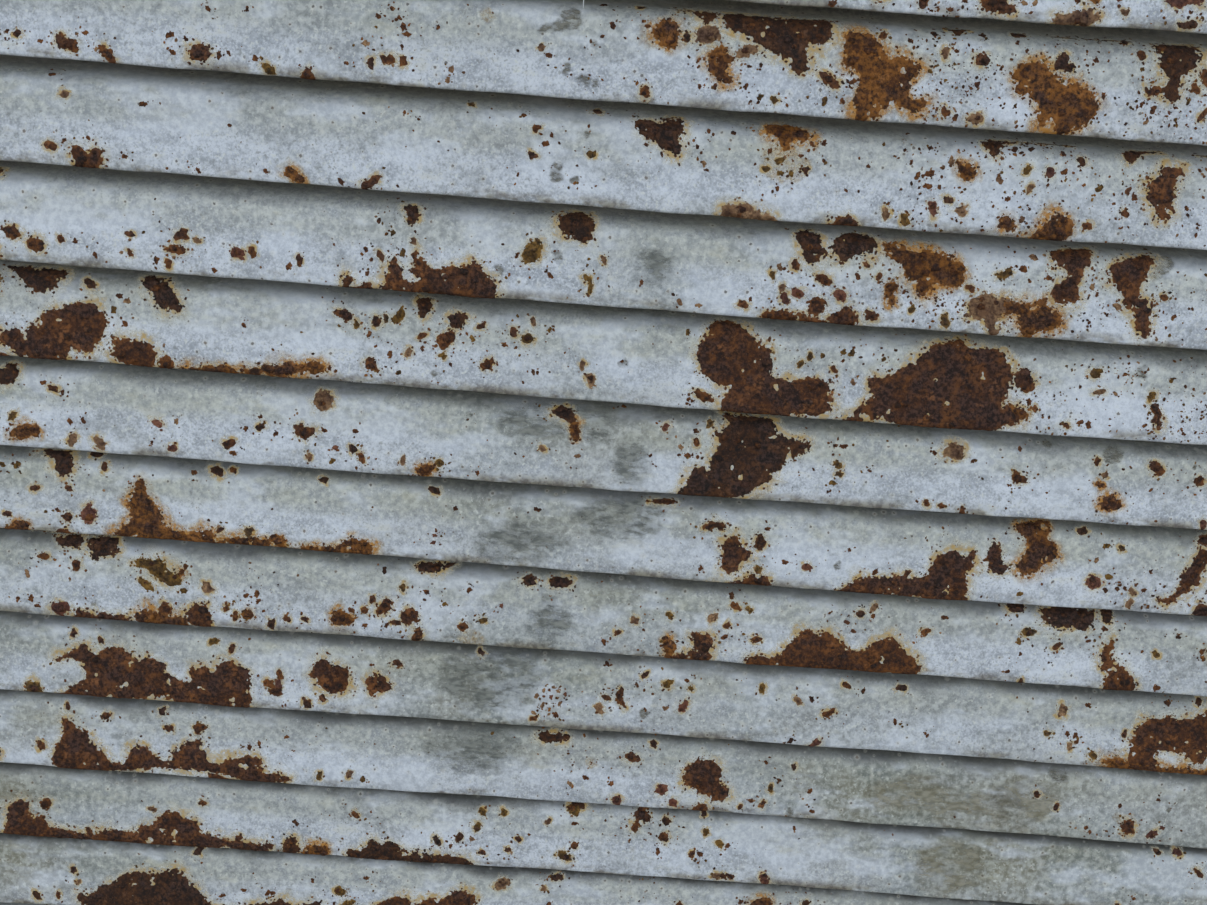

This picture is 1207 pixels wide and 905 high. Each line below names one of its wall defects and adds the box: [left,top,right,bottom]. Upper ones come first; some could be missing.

corrosion [256,163,309,184]
corrosion [0,167,613,491]
corrosion [514,0,1207,520]
corrosion [0,380,503,784]
corrosion [0,451,1207,905]